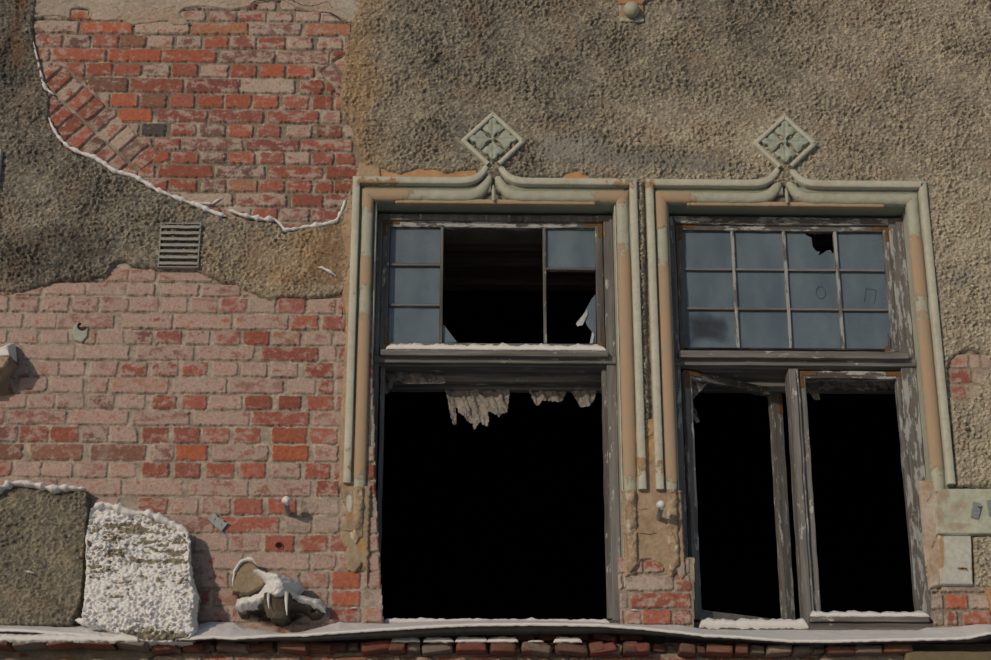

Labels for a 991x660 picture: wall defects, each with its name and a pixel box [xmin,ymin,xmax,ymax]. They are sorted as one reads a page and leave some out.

crack [250,0,352,24]
flaking render [34,1,629,234]
flaking render [0,251,383,633]
peeling [909,232,991,477]
flaking render [931,582,991,628]